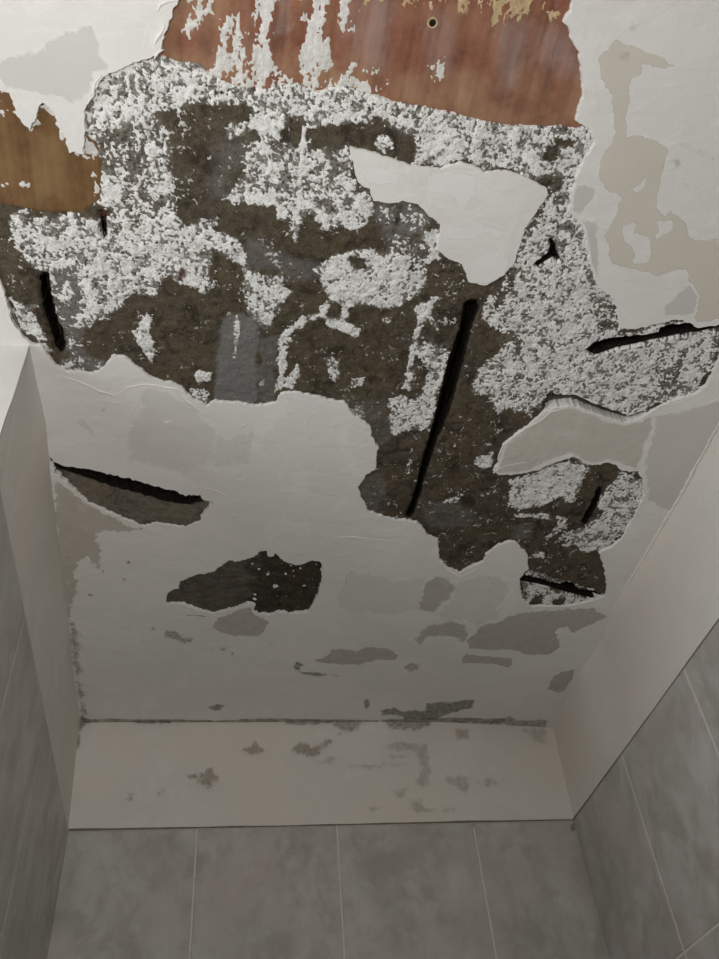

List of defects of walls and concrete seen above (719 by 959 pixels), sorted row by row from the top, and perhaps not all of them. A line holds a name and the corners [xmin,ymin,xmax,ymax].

crack [39,272,66,352]
spalling [0,24,719,667]
crack [586,323,719,354]
crack [406,299,479,517]
crack [50,458,203,504]
crack [520,575,601,598]
crack [69,618,719,831]